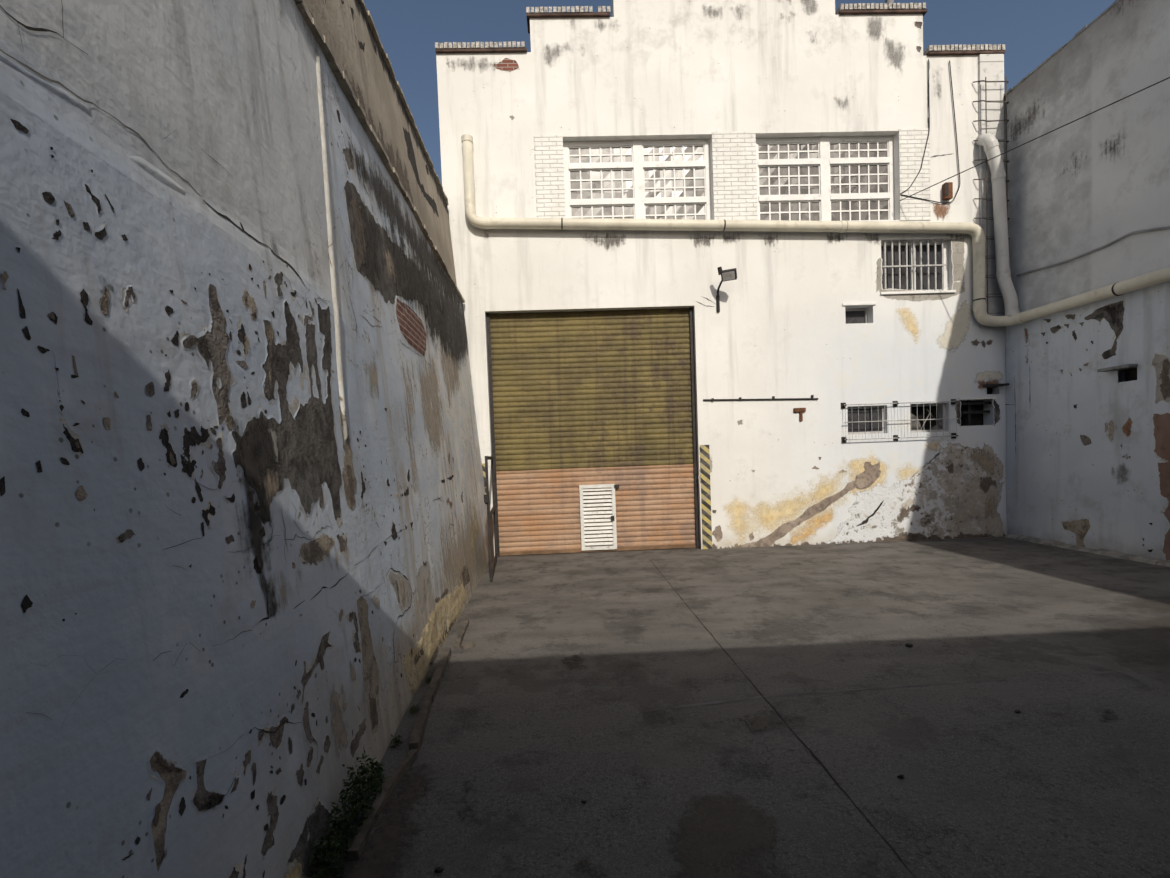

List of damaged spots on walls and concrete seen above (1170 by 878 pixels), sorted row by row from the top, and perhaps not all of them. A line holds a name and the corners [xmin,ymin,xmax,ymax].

crack [0,0,434,368]
spalling [146,261,367,569]
spalling [324,98,432,361]
damp [341,65,468,490]
damp [712,458,885,549]
spalling [740,443,1004,548]
spalling [992,399,1001,427]
spalling [1041,300,1125,376]
spalling [1142,352,1170,561]
spalling [122,560,475,878]
crack [650,560,916,878]